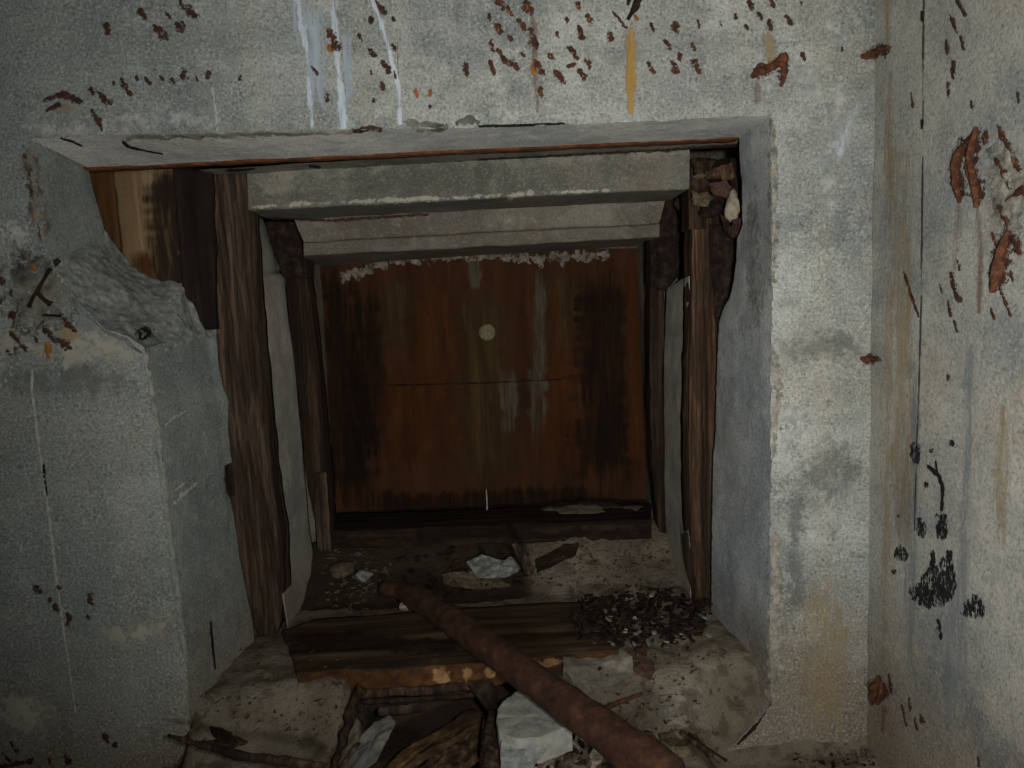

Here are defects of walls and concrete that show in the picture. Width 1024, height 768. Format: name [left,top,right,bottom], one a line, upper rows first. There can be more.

corrosion [43,68,211,132]
corrosion [136,0,200,41]
water stain [292,0,353,130]
water stain [371,0,402,125]
corrosion [487,0,594,99]
corrosion [634,15,701,74]
spalling [0,104,383,356]
spalling [342,189,610,206]
peeling [691,161,738,207]
corrosion [981,124,1022,190]
corrosion [0,276,77,359]
corrosion [939,260,962,332]